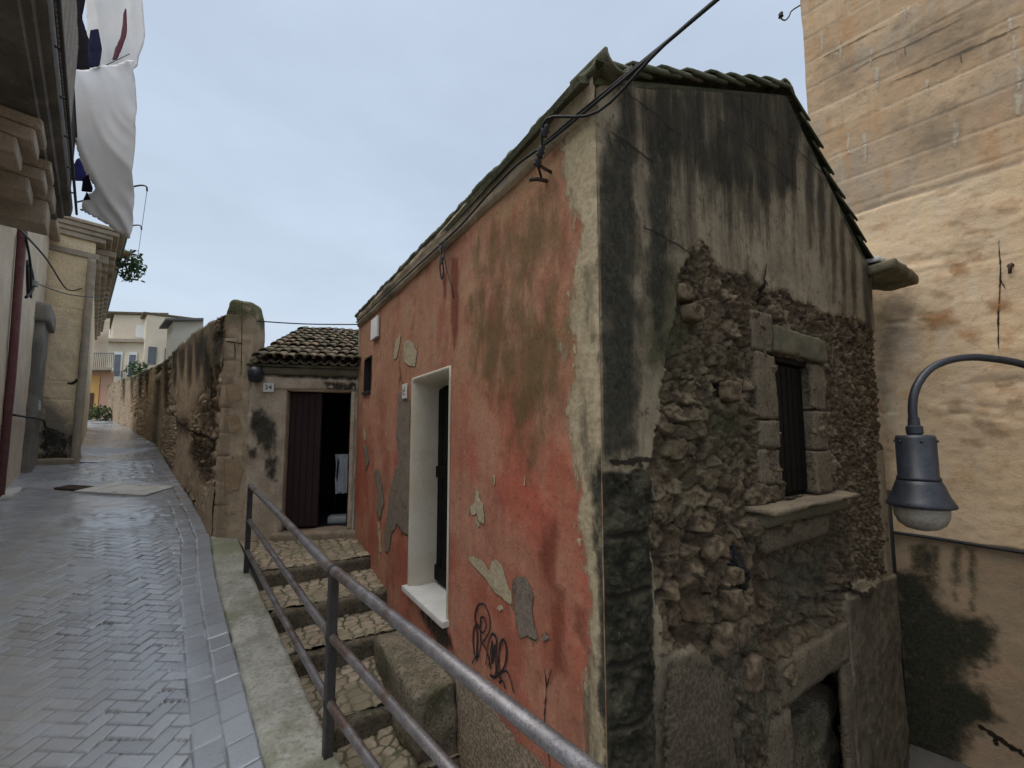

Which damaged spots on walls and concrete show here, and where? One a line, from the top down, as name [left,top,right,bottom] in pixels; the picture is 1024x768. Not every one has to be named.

damp [247,408,278,482]
spalling [363,393,411,554]
peeling [394,334,417,367]
peeling [468,487,487,527]
damp [443,258,557,420]
damp [585,83,873,768]
spalling [646,240,895,768]
crack [997,241,1005,348]
spalling [468,556,550,647]
damp [897,547,1003,761]